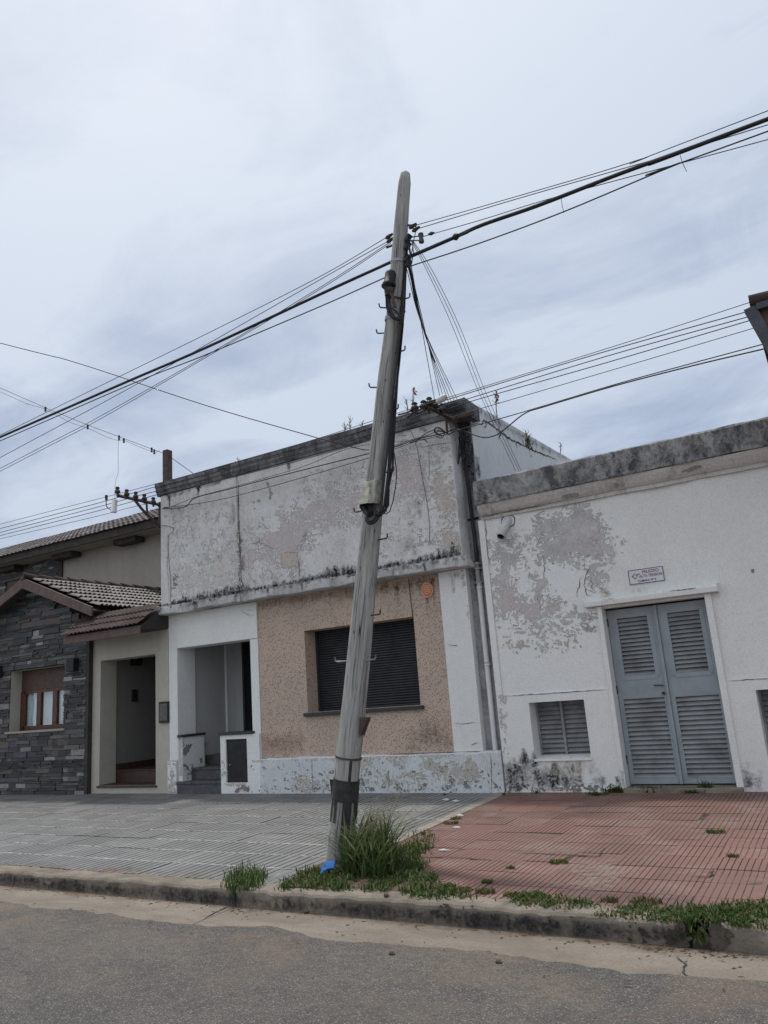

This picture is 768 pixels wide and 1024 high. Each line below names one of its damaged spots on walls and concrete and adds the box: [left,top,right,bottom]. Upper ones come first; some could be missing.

peeling [162,459,368,602]
leakage [159,565,356,612]
leakage [378,542,465,585]
peeling [487,501,626,657]
peeling [359,753,615,793]
leakage [503,749,580,791]